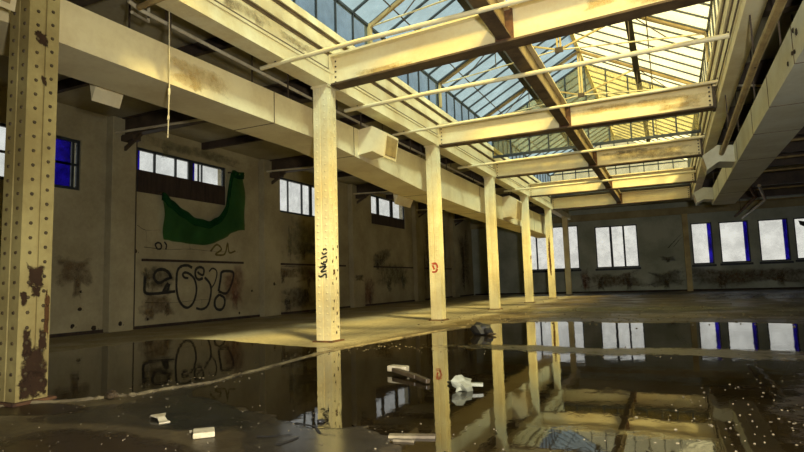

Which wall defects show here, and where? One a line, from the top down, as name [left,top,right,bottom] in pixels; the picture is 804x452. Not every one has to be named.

corrosion [18,290,50,400]